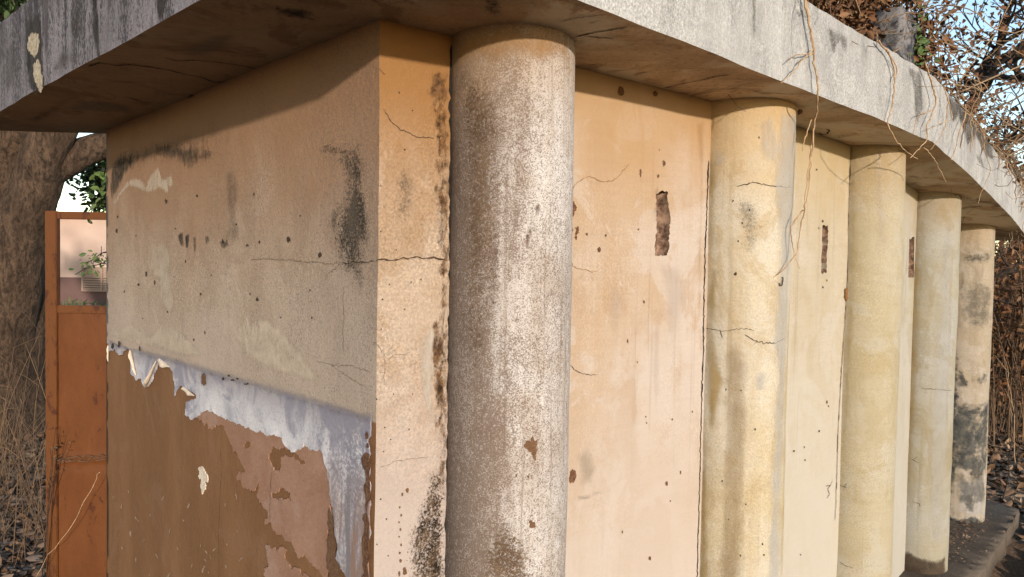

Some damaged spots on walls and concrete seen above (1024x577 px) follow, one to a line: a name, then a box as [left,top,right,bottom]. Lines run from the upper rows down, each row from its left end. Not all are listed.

leakage [110,121,230,198]
peeling [106,340,391,577]
leakage [320,142,370,294]
crack [251,45,452,397]
crack [380,423,448,487]
leakage [407,469,446,577]
rust [427,71,449,496]
spalling [654,190,671,256]
crack [697,163,783,576]
leakage [907,211,992,544]